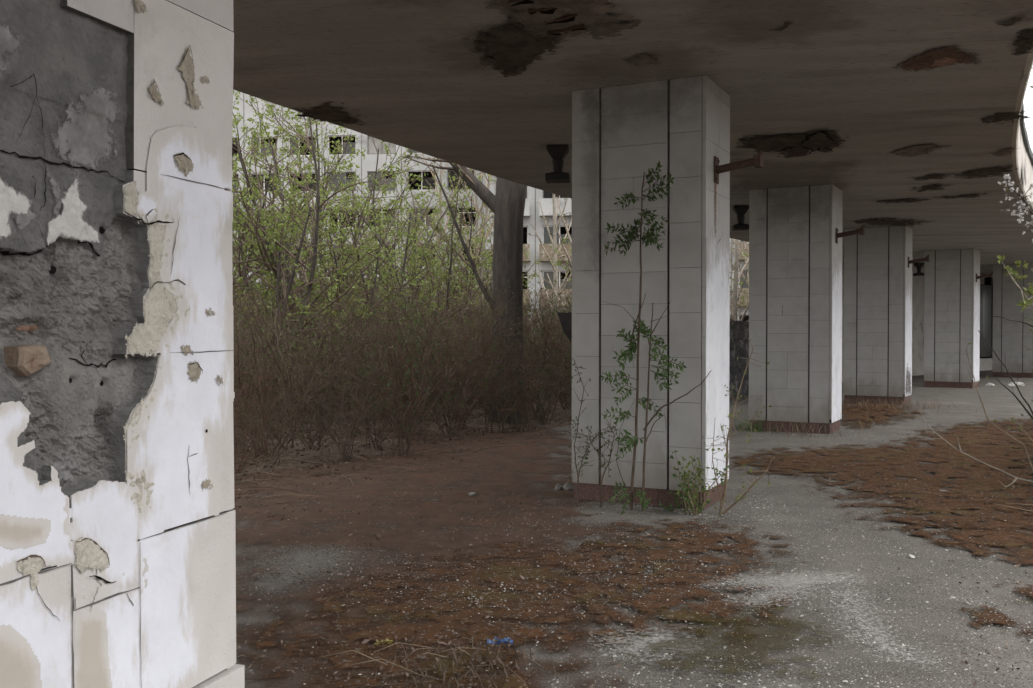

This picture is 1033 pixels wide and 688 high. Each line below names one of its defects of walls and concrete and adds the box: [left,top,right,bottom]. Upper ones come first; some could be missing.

spalling [466,0,641,77]
spalling [996,17,1033,55]
spalling [895,45,980,71]
spalling [290,102,365,125]
spalling [736,130,847,158]
spalling [876,148,1021,204]
spalling [845,217,929,227]
spalling [0,0,235,688]